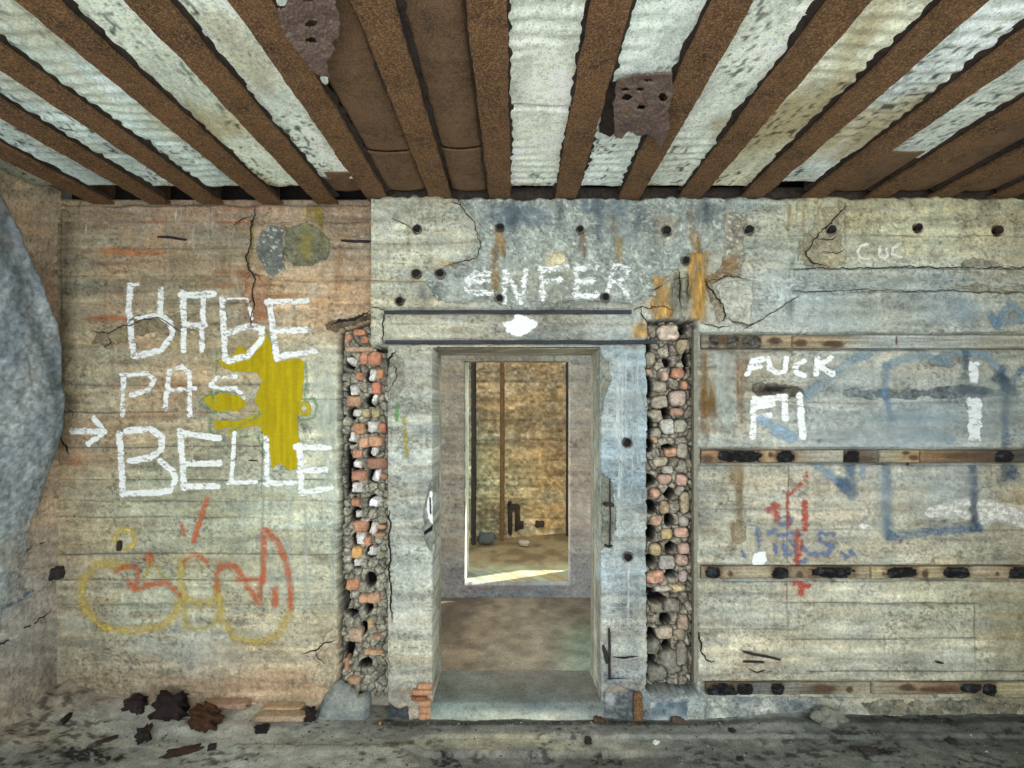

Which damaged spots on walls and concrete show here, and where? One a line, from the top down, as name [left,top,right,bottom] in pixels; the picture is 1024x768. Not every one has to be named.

corrosion [170,0,340,198]
corrosion [275,0,394,192]
corrosion [579,0,711,191]
crack [233,208,261,330]
spalling [242,222,330,317]
crack [445,197,482,266]
corrosion [633,278,673,338]
corrosion [688,235,711,320]
crack [633,205,1024,329]
spalling [307,314,434,720]
spalling [601,322,692,720]